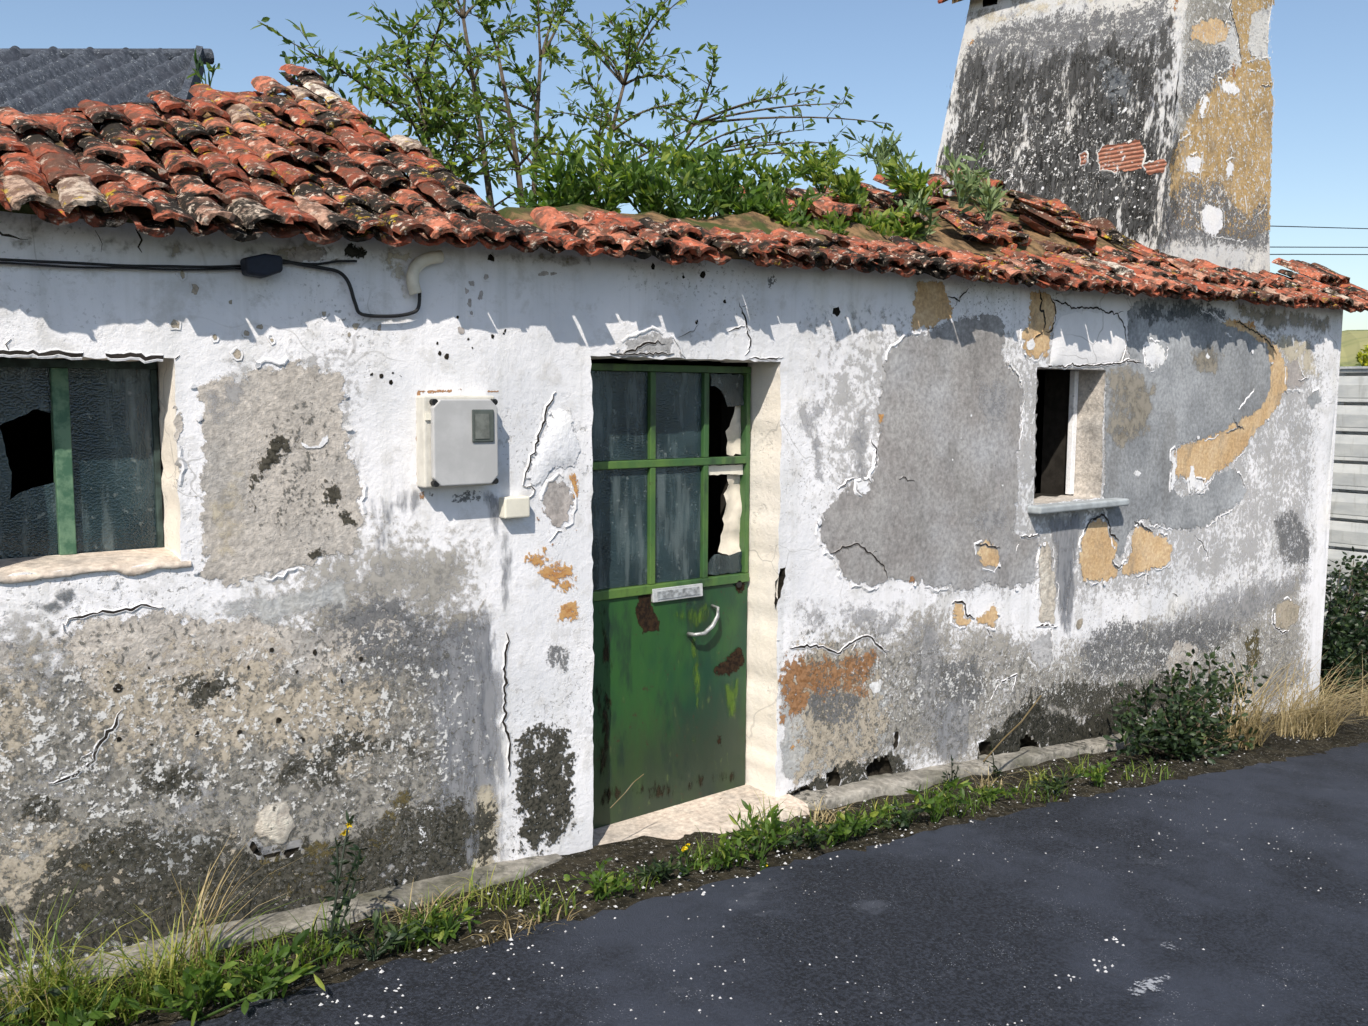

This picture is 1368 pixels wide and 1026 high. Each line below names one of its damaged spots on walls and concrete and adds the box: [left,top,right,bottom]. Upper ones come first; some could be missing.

water stain [936,0,1273,253]
peeling [1078,0,1275,245]
peeling [64,324,407,749]
crack [522,391,556,498]
rust [524,547,579,622]
rust [778,649,879,724]
crack [777,634,890,659]
crack [830,542,888,578]
peeling [815,276,1059,671]
peeling [1078,296,1322,587]